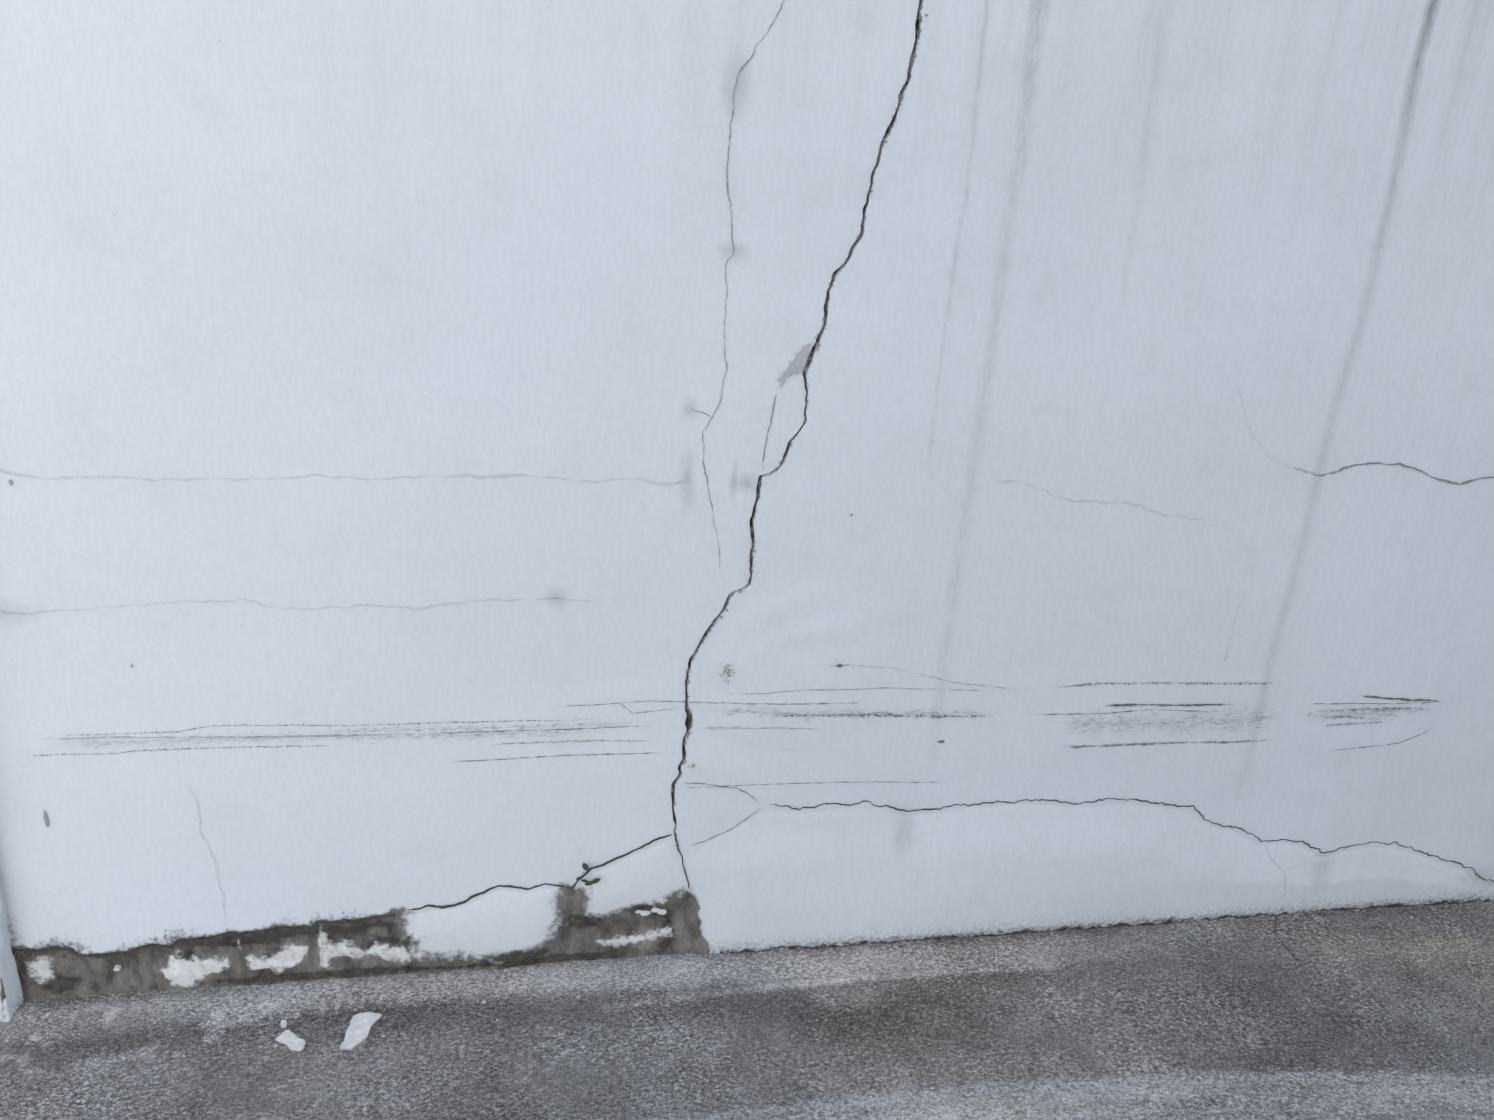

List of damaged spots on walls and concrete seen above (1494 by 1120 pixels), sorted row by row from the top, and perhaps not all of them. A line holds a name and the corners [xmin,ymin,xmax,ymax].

crack [408,0,1494,910]
spalling [0,884,710,1010]